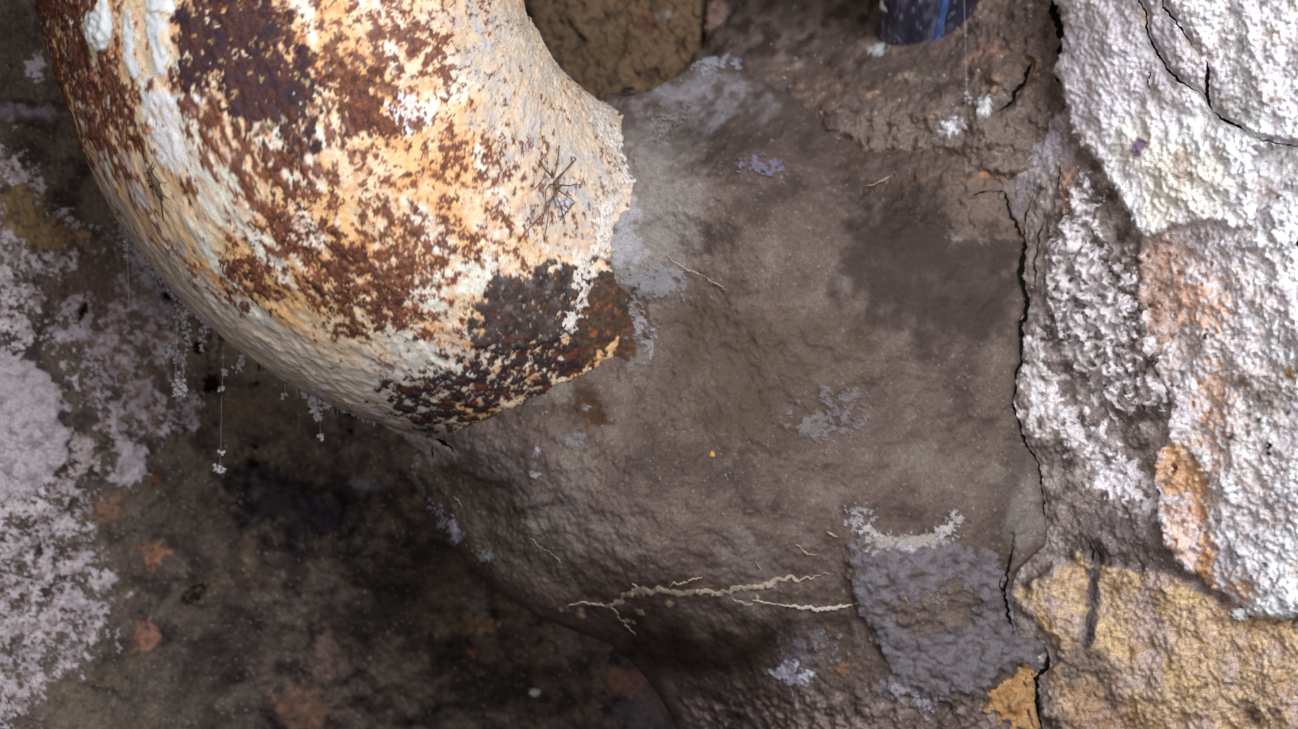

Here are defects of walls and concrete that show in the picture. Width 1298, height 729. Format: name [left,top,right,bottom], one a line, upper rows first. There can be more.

corrosion [35,0,155,168]
crack [996,0,1064,112]
crack [1138,0,1297,147]
corrosion [169,0,420,343]
corrosion [365,256,657,438]
crack [974,165,1061,544]
efflorescence [0,144,205,729]
crack [431,438,455,458]
efflorescence [844,502,964,557]
crack [999,537,1014,631]
crack [1033,645,1050,729]